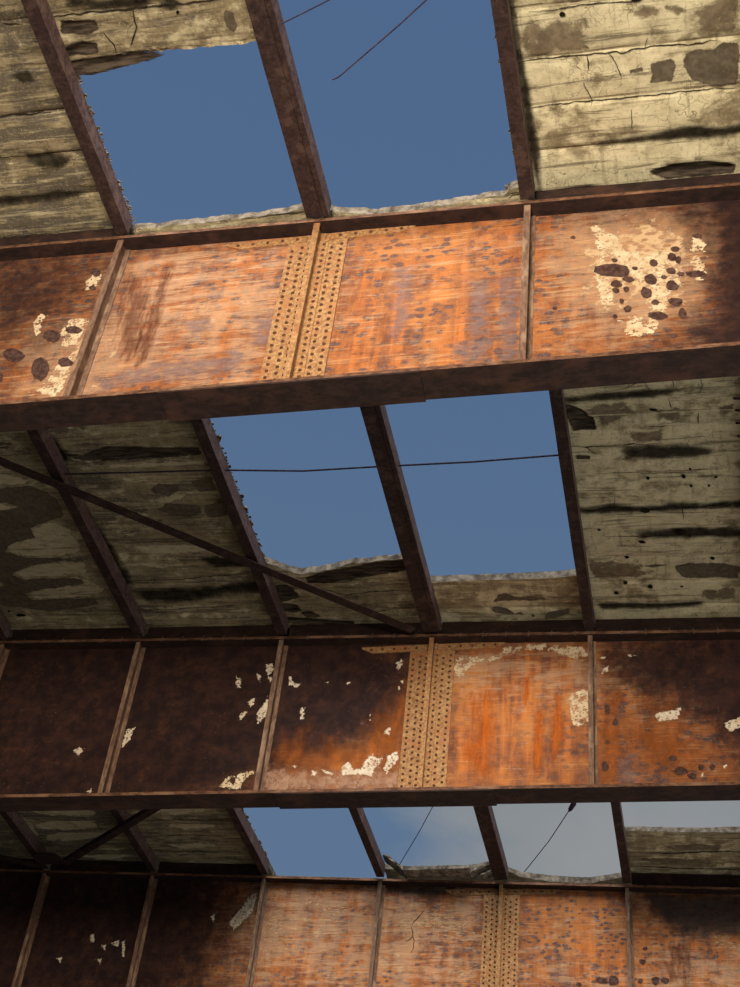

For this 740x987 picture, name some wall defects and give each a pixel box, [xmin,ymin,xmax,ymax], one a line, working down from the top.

spalling [60,19,163,76]
leakage [509,0,540,182]
leakage [600,124,740,144]
peeling [590,225,707,338]
corrosion [594,246,707,320]
corrosion [43,326,82,342]
corrosion [3,348,73,381]
peeling [29,318,89,397]
leakage [623,445,711,459]
leakage [580,500,740,514]
peeling [311,752,399,777]
corrosion [596,976,623,987]